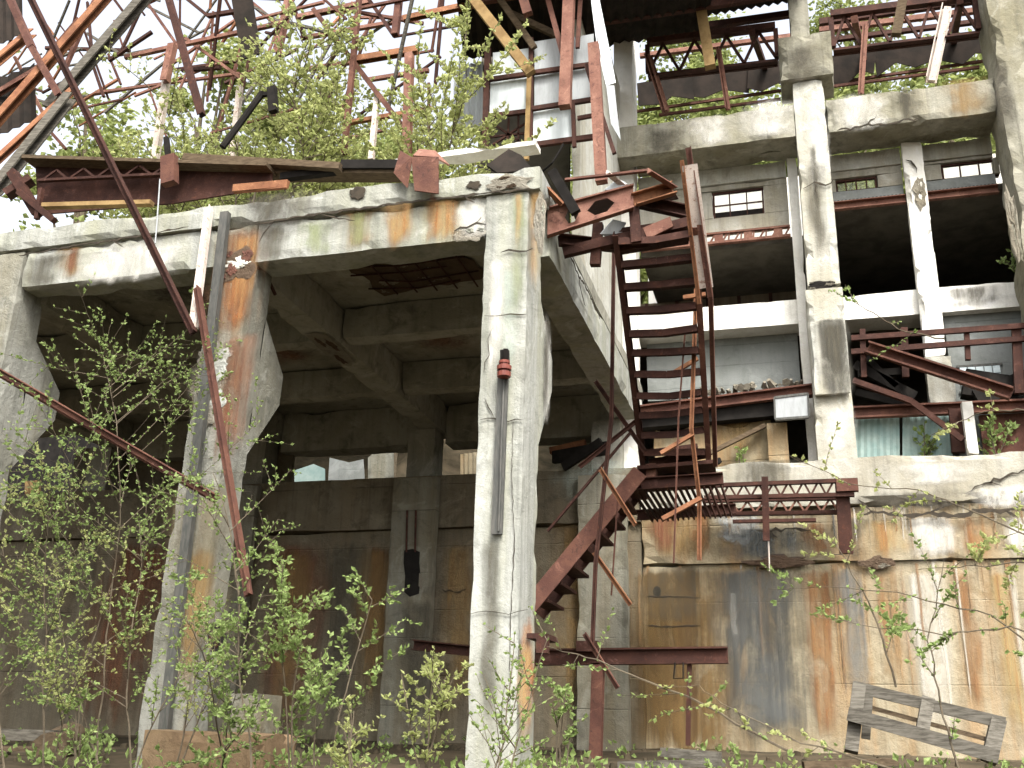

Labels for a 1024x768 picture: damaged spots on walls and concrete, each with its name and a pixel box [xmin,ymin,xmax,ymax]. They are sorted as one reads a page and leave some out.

crack [837,115,918,131]
spalling [452,227,486,242]
spalling [466,173,547,256]
spalling [912,177,927,211]
spalling [223,245,257,283]
rust [219,277,248,325]
spalling [741,554,815,568]
spalling [857,555,896,570]
rust [955,566,972,629]
rust [809,567,845,729]
rust [971,559,1024,721]
rust [648,665,696,734]